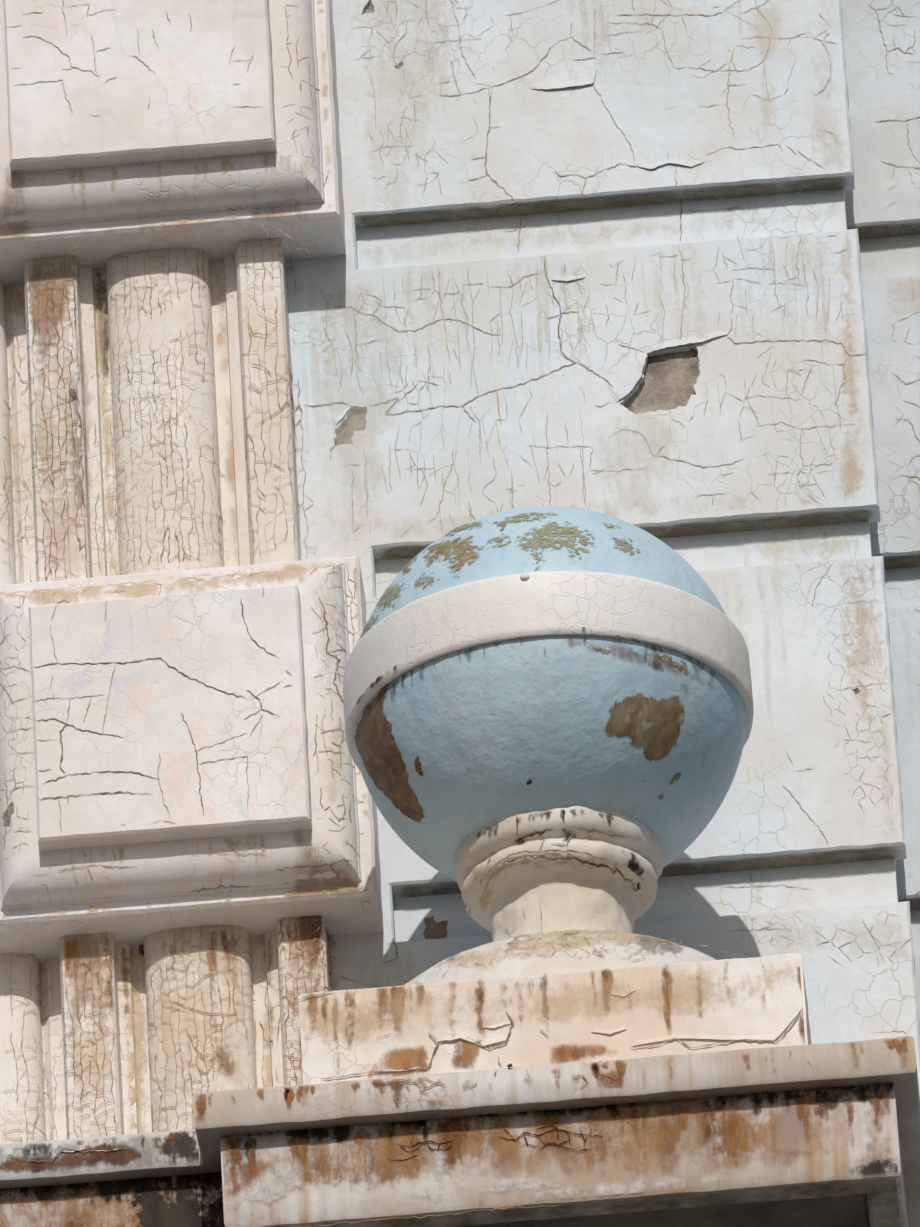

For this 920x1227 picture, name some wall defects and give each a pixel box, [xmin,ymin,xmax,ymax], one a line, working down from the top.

crack [282,5,328,201]
crack [354,0,838,250]
crack [870,5,920,207]
spalling [606,331,728,414]
spalling [332,406,367,447]
crack [0,158,868,1163]
crack [812,563,894,808]
rust [379,989,406,1029]
rust [369,1048,427,1107]
rust [453,1041,479,1067]
rust [552,1045,606,1062]
water stain [0,1120,466,1227]